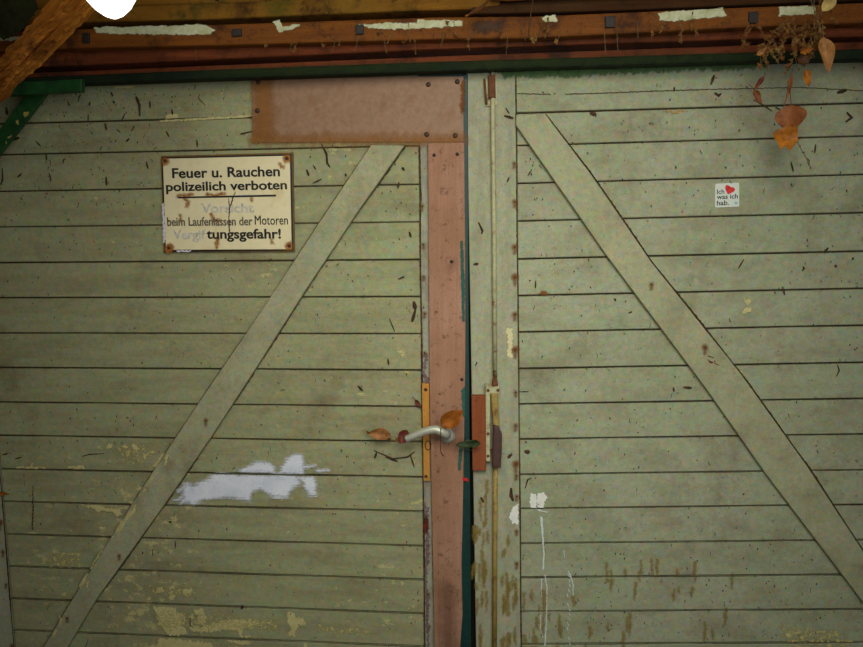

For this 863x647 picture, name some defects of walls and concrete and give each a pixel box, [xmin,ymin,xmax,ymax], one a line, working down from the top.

peeling [80,500,137,538]
corrosion [472,480,488,614]
peeling [132,583,308,647]
corrosion [500,563,562,647]